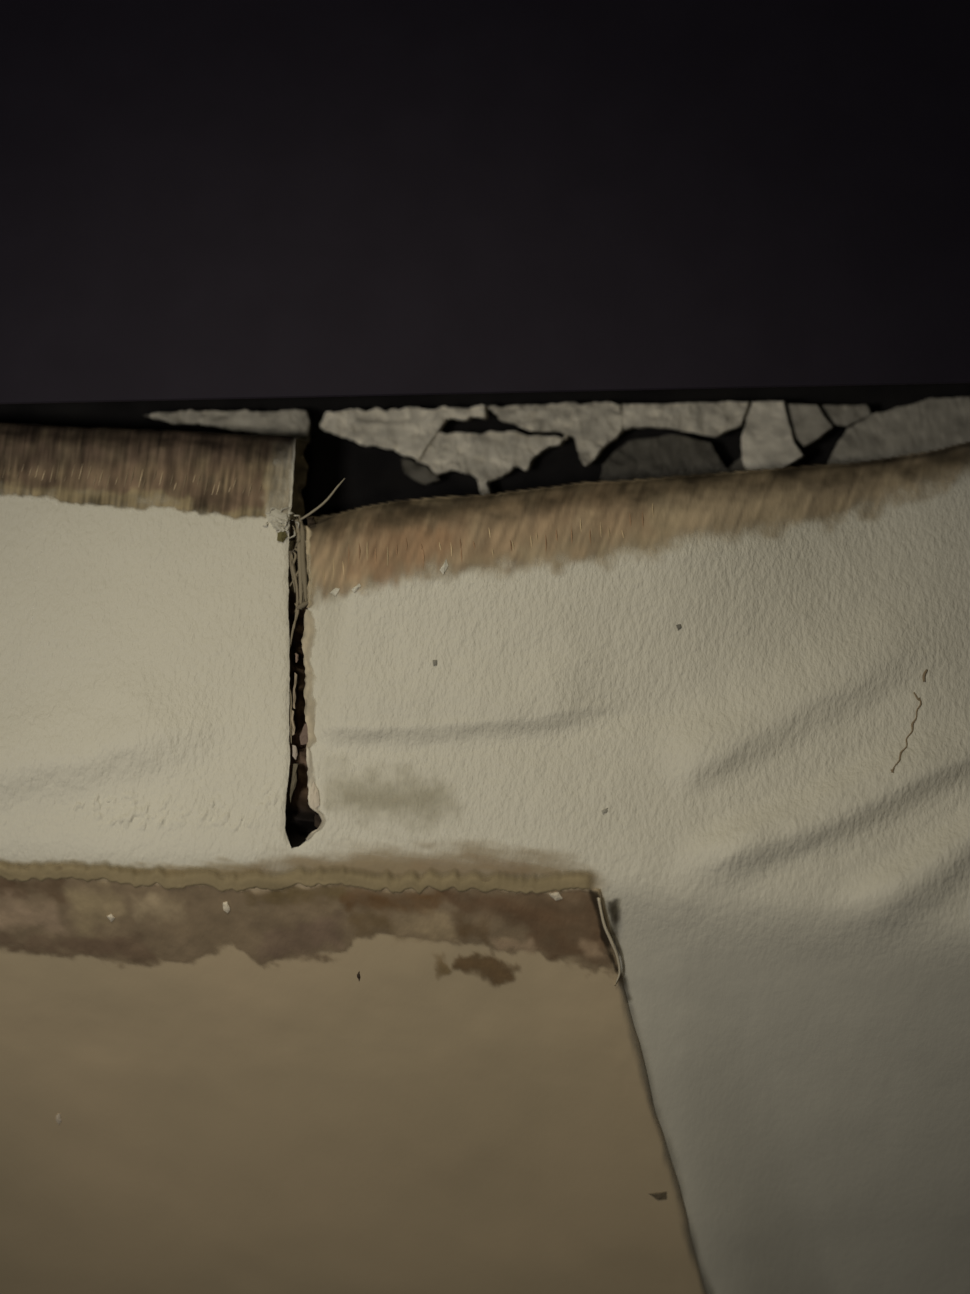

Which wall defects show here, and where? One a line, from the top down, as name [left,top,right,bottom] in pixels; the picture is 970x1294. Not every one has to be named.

flaking render [0,397,970,519]
crack [263,438,345,848]
leakage [120,866,270,877]
leakage [287,852,593,880]